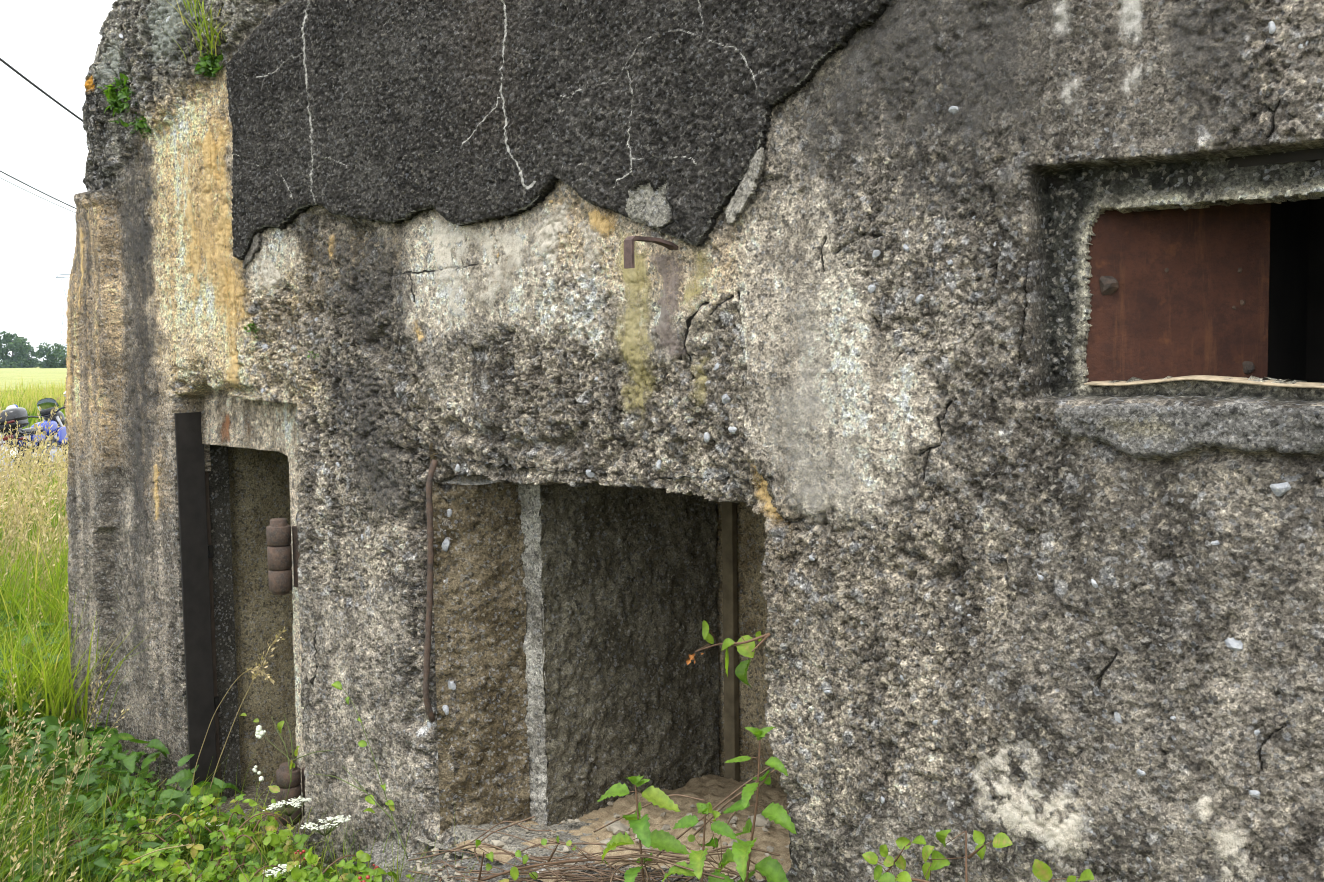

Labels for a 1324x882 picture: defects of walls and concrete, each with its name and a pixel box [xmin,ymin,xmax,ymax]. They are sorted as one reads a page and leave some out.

crack [233,2,345,204]
crack [424,0,536,189]
crack [560,37,651,184]
crack [684,0,754,78]
corrosion [588,210,706,411]
spalling [179,159,1093,858]